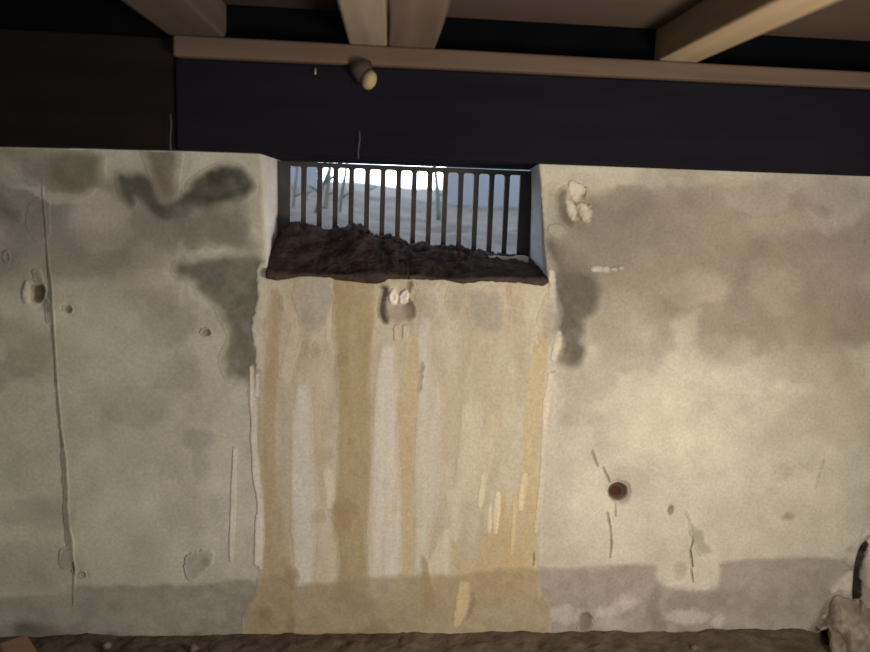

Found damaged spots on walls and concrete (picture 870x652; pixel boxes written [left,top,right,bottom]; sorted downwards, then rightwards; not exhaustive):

spalling [21,268,74,315]
crack [41,177,77,606]
damp [0,148,268,637]
damp [277,321,340,582]
damp [365,343,402,576]
rust [242,276,553,635]
spalling [376,279,440,341]
damp [413,320,501,574]
damp [533,181,625,534]
crack [591,449,617,559]
crack [685,511,714,583]
peeling [829,531,870,596]